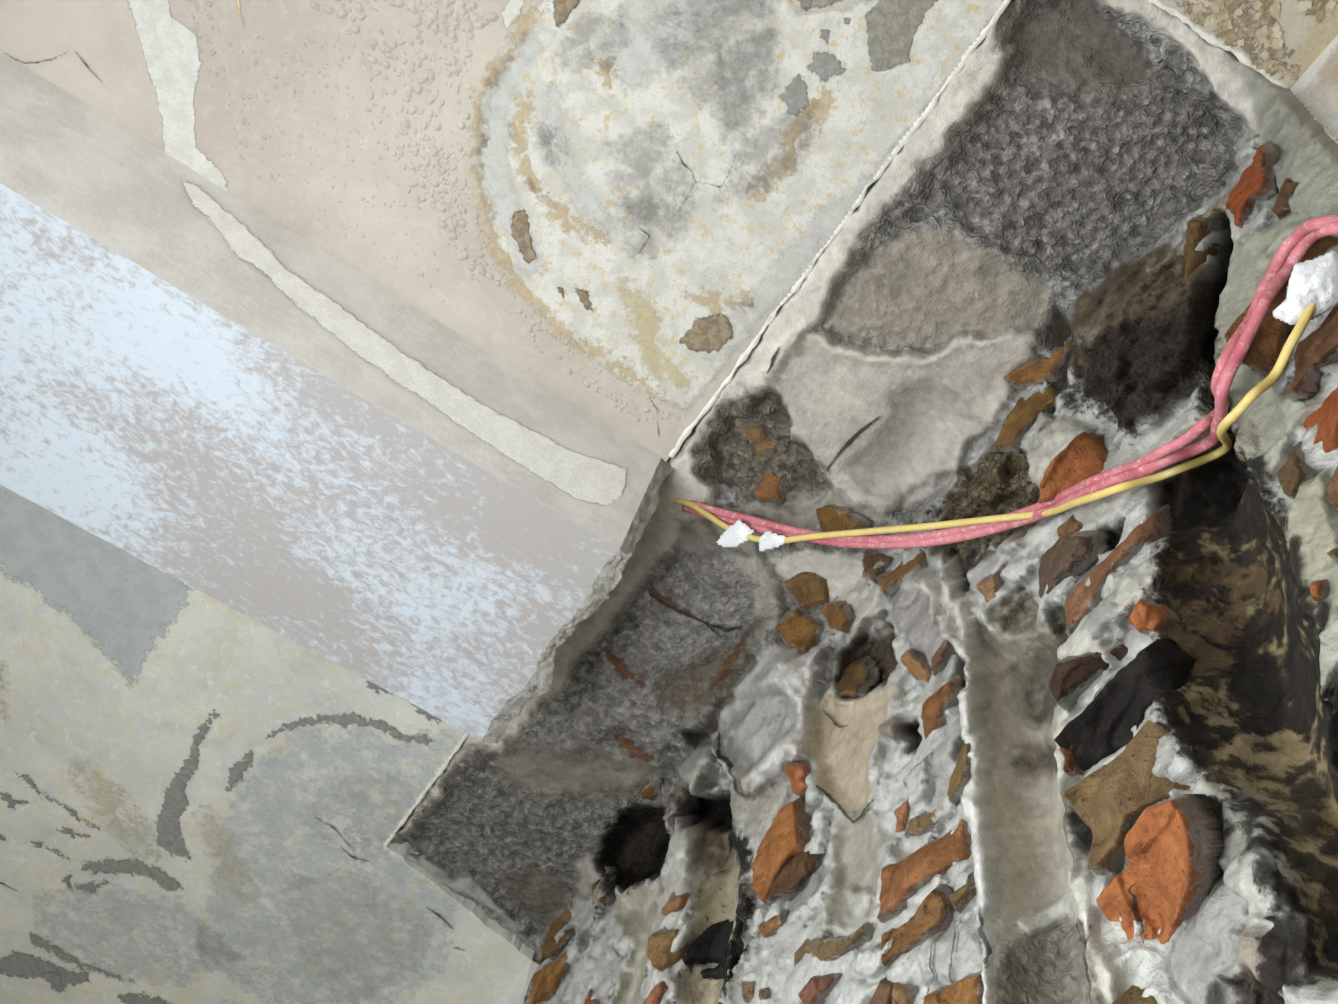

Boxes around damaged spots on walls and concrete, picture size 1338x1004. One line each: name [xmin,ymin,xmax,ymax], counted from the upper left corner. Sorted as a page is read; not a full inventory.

peeling [127,0,628,506]
leakage [469,0,1002,409]
spalling [0,933,171,1004]
spalling [0,709,220,894]
spalling [226,750,254,792]
spalling [265,703,441,748]
spalling [383,0,1338,1004]
leakage [1156,281,1338,1004]